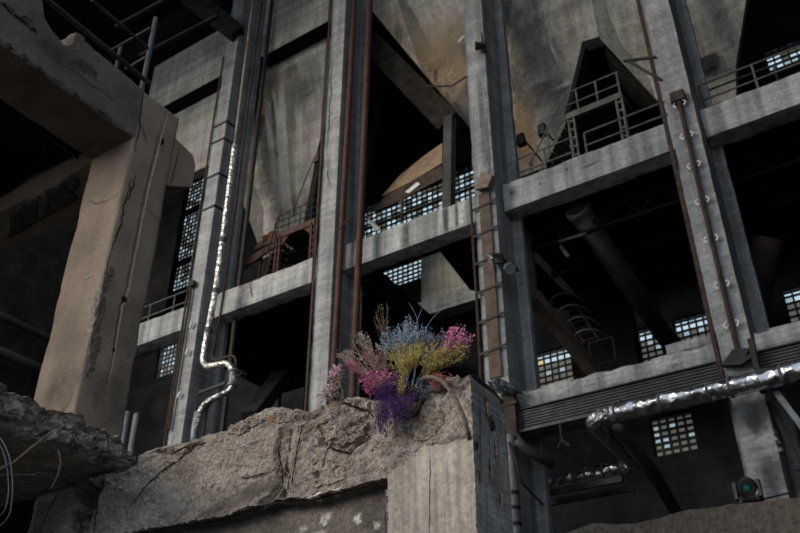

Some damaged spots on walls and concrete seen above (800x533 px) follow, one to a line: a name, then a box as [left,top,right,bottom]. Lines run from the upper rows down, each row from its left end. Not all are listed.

crack [1,97,179,391]
spalling [86,264,114,377]
crack [133,438,388,533]
crack [319,428,370,458]